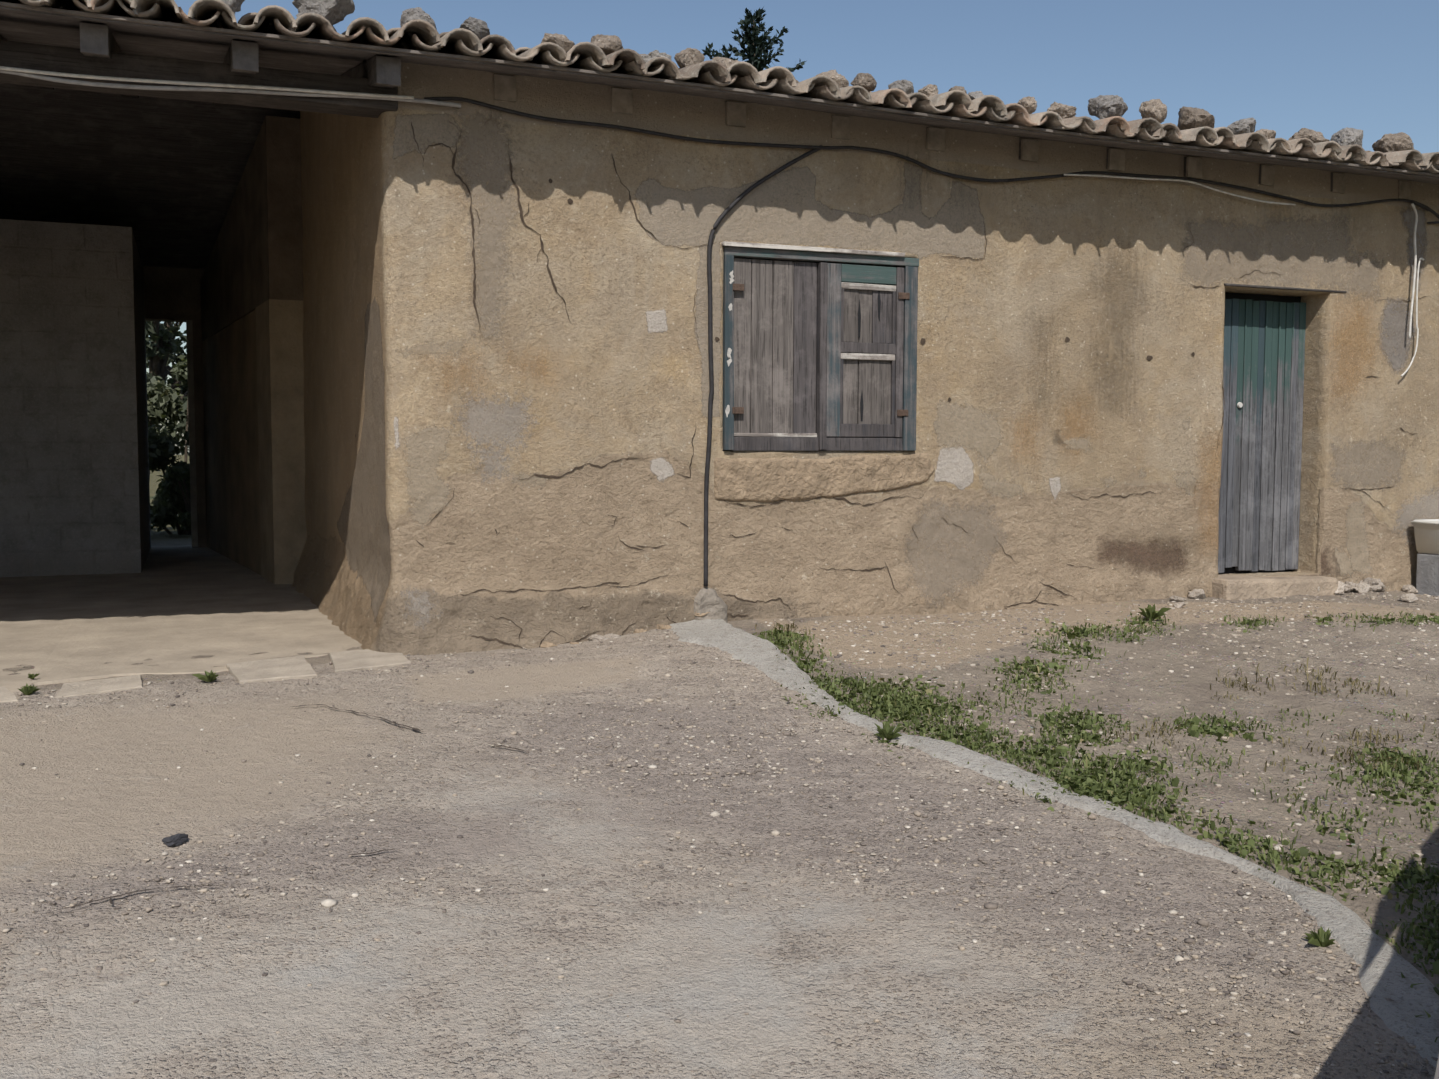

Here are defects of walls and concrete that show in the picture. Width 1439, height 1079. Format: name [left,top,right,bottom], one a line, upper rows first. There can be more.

crack [612,156,708,249]
crack [411,119,570,339]
crack [939,220,987,260]
spalling [635,163,985,418]
crack [519,429,696,480]
peeling [934,446,974,490]
crack [1070,491,1161,500]
crack [452,514,688,648]
crack [723,594,790,617]
crack [724,491,1095,609]
water stain [1099,542,1182,571]